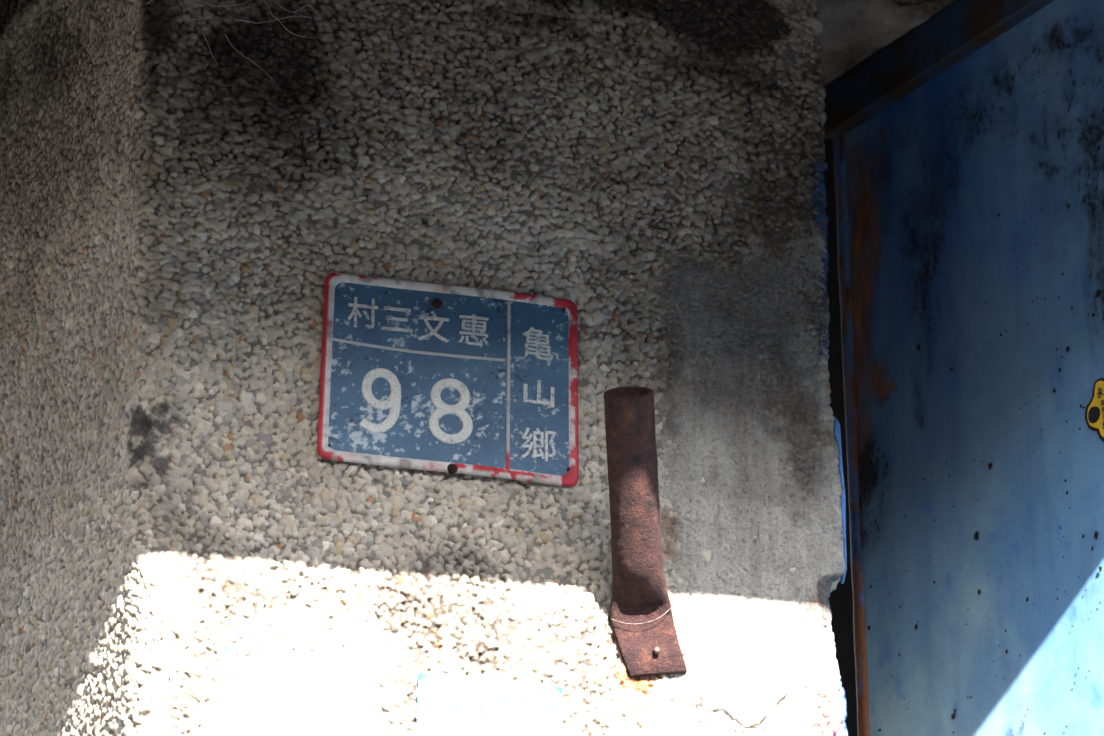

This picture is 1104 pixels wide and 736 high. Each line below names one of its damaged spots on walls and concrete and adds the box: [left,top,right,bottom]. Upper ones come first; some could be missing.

water stain [0,0,110,207]
water stain [143,0,824,190]
water stain [1030,69,1104,321]
spalling [803,574,840,633]
crack [707,693,789,736]